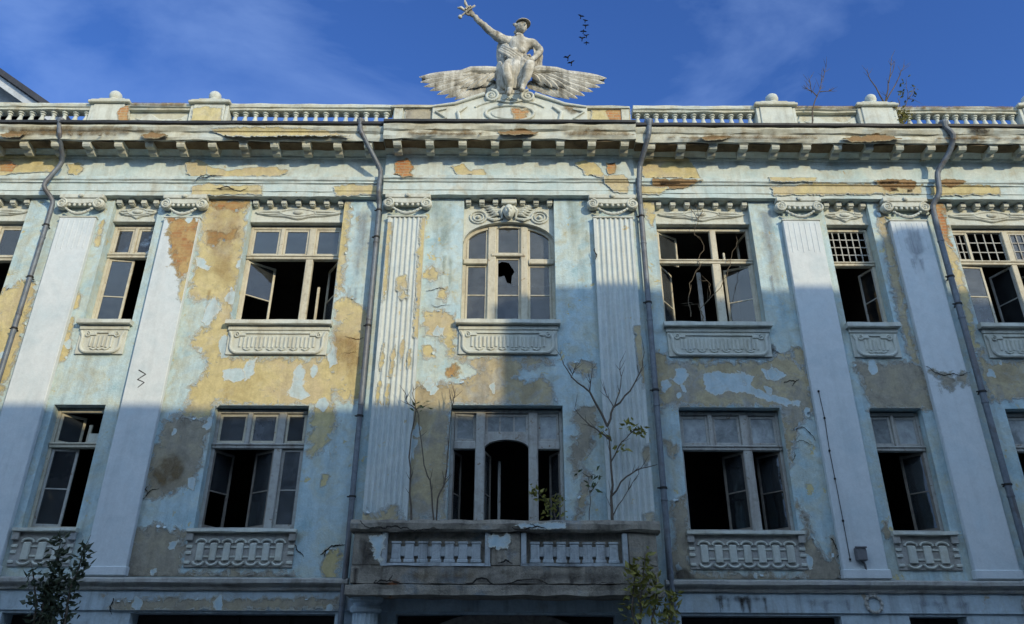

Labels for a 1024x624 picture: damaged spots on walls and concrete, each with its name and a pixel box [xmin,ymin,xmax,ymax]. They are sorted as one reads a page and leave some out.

peeling [0,278,41,402]
peeling [143,158,600,521]
peeling [632,325,814,470]
peeling [767,177,1024,413]
crack [353,575,438,585]
crack [360,521,439,532]
crack [463,559,549,585]